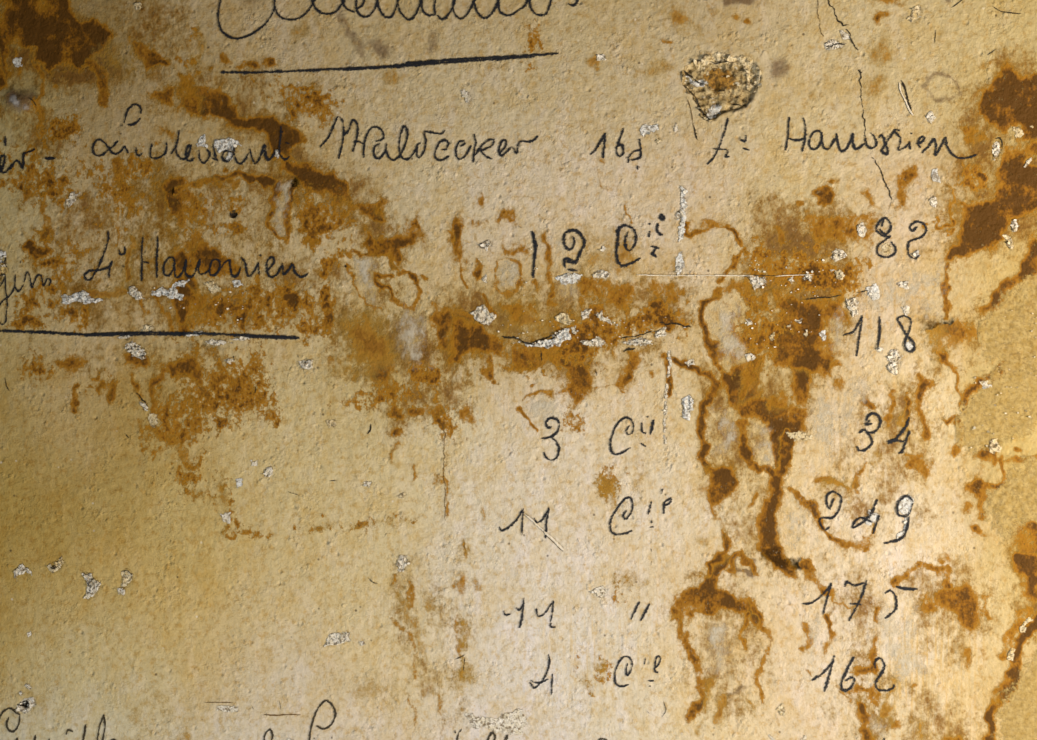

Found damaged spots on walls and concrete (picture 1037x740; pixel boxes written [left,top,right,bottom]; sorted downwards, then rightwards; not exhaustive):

flaking render [682,51,762,128]
damp [133,152,306,245]
peeling [675,185,688,275]
damp [345,249,428,360]
damp [684,219,758,371]
peeling [470,304,695,444]
damp [963,446,1037,537]
flaking render [14,565,32,578]
flaking render [80,572,101,599]
flaking render [117,570,133,596]
damp [670,554,773,735]
damp [981,605,1037,740]